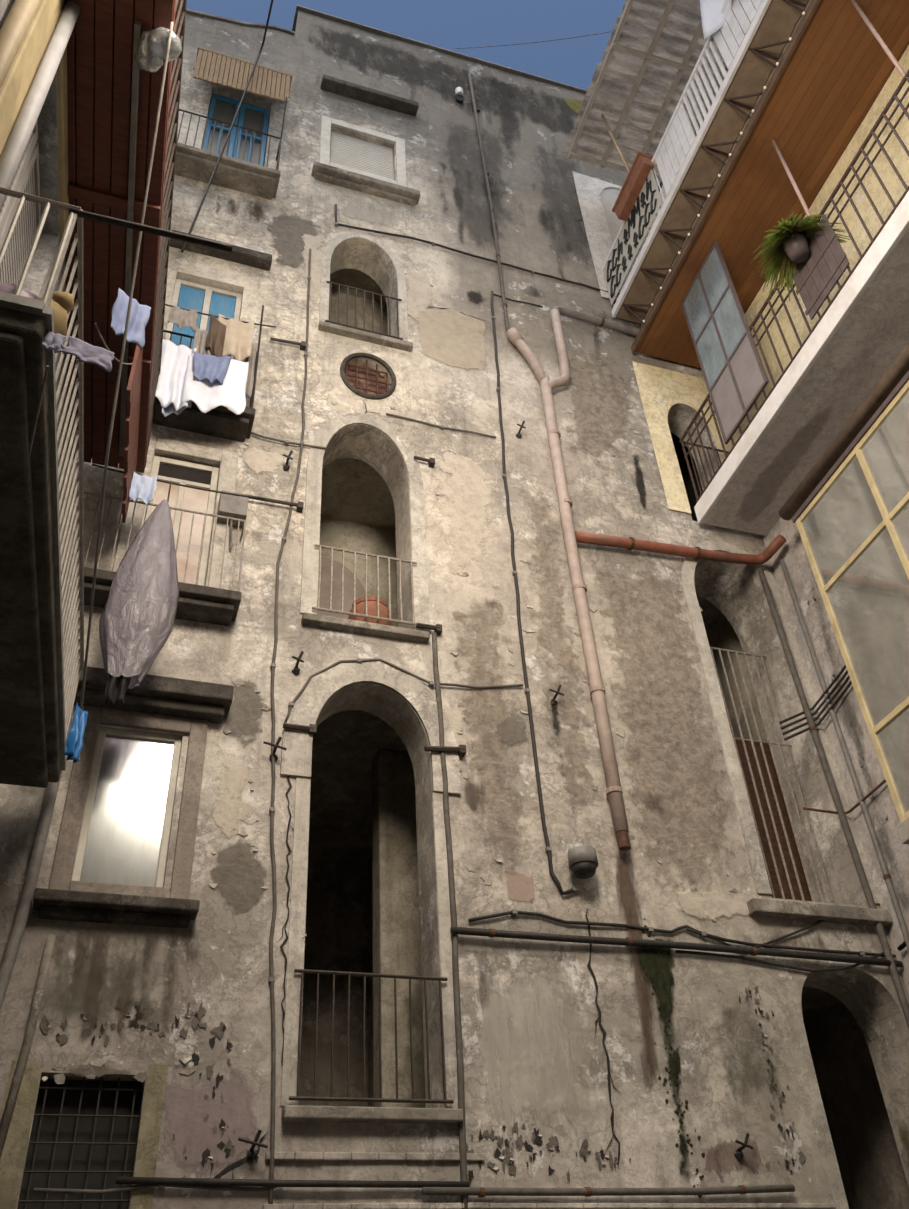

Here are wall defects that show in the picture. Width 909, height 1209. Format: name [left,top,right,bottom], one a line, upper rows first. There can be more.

damp [321,29,578,244]
damp [540,147,587,257]
damp [77,930,107,1037]
corrosion [617,851,657,1083]
flaking render [39,997,259,1178]
flaking render [466,1122,570,1182]
flaking render [576,1139,631,1169]
flaking render [739,986,806,1175]